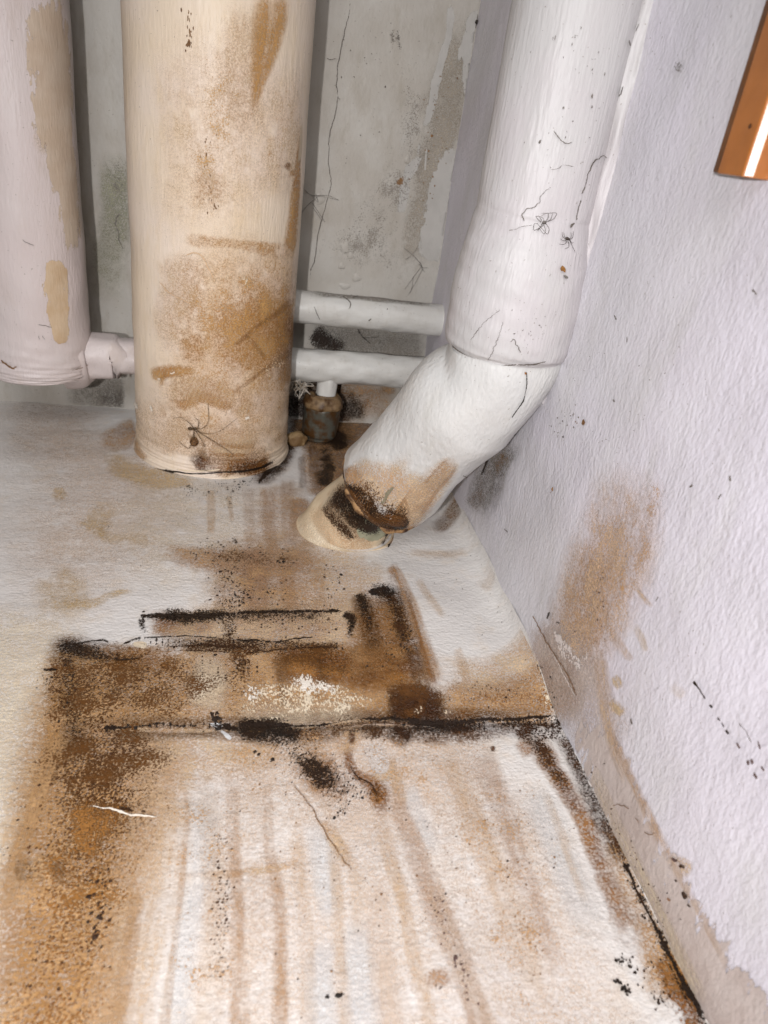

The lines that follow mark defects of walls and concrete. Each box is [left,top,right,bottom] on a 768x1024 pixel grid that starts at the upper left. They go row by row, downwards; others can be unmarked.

corrosion [134,102,300,476]
corrosion [194,1,285,218]
crack [310,10,350,275]
corrosion [0,419,703,1024]